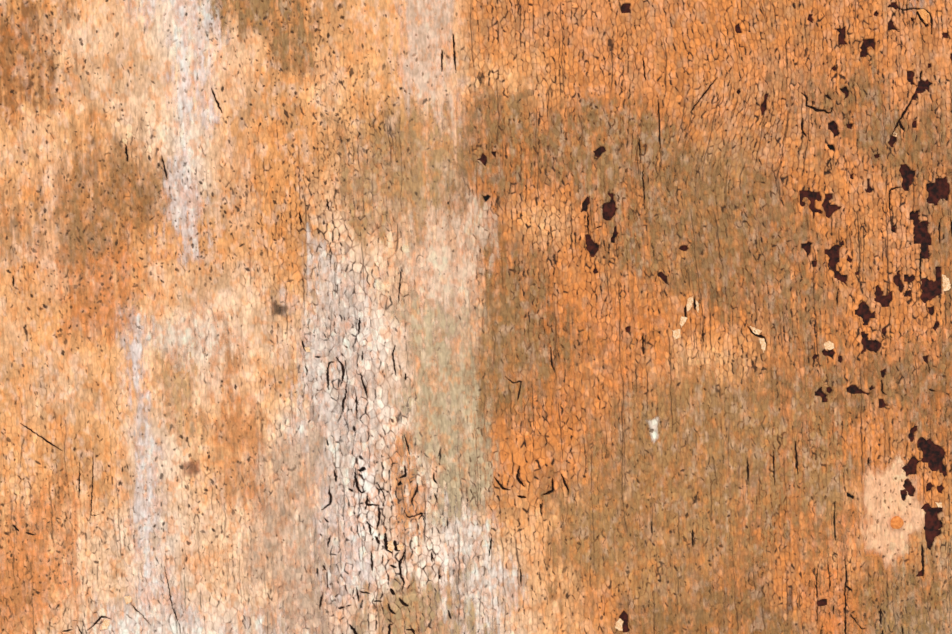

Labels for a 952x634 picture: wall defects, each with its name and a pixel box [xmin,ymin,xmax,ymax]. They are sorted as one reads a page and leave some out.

crack [890,71,922,137]
peeling [799,190,841,218]
peeling [801,241,859,286]
peeling [855,211,951,354]
crack [302,318,368,431]
crack [392,347,406,380]
corrosion [529,293,668,413]
corrosion [0,500,76,632]
crack [317,435,448,634]
corrosion [391,431,423,539]
corrosion [818,505,865,634]
peeling [847,426,947,568]